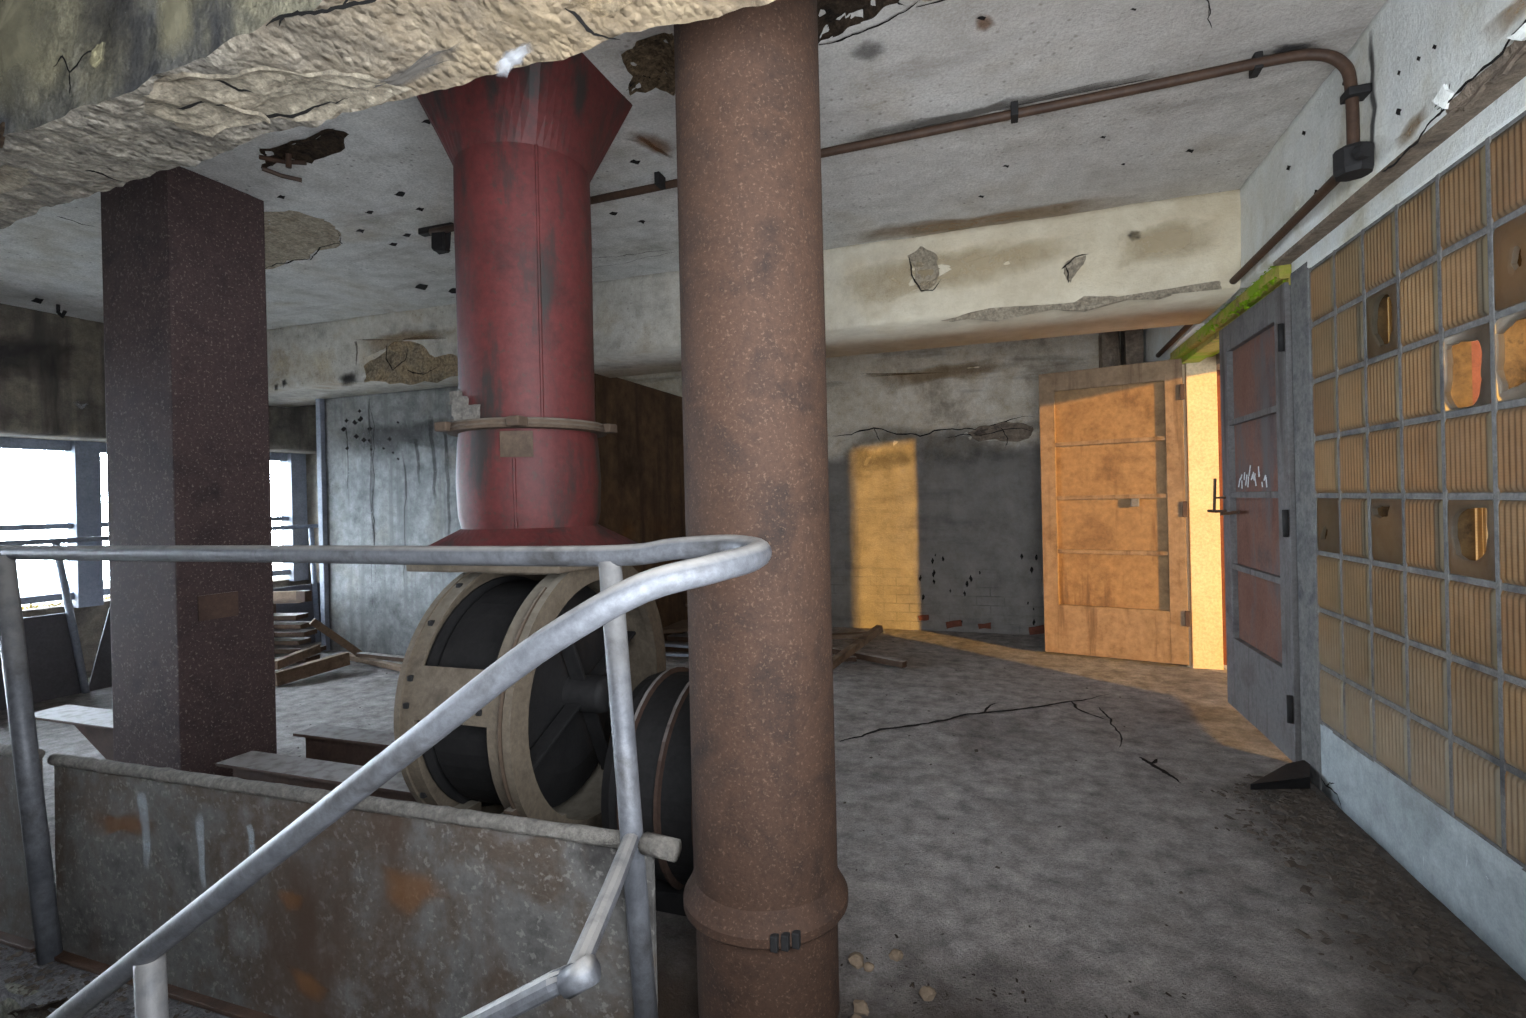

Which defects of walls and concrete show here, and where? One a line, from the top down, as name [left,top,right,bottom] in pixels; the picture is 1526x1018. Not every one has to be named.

crack [266,0,376,26]
spalling [565,0,675,96]
spalling [817,0,945,45]
spalling [1432,19,1526,115]
spalling [143,66,412,269]
spalling [890,246,1020,293]
spalling [364,341,458,385]
water stain [366,409,450,546]
crack [840,694,1182,784]